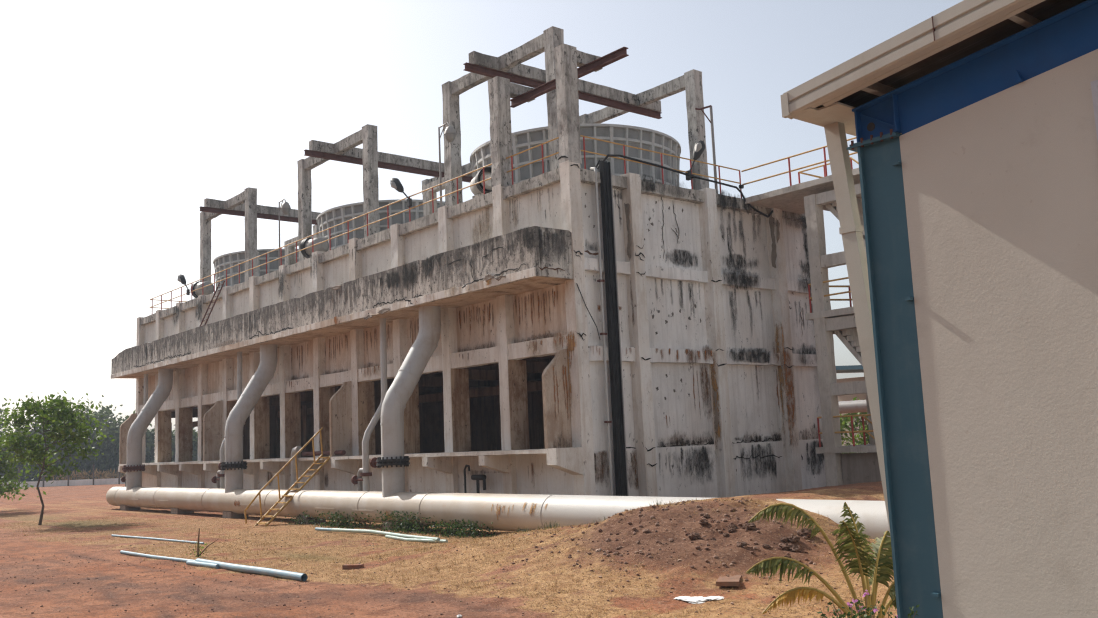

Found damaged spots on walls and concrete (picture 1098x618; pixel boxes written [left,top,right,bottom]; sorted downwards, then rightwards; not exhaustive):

damp [368,254,448,291]
damp [508,228,563,261]
damp [718,190,762,327]
corrosion [527,332,575,416]
corrosion [656,345,721,447]
corrosion [773,324,818,444]
damp [659,439,713,478]